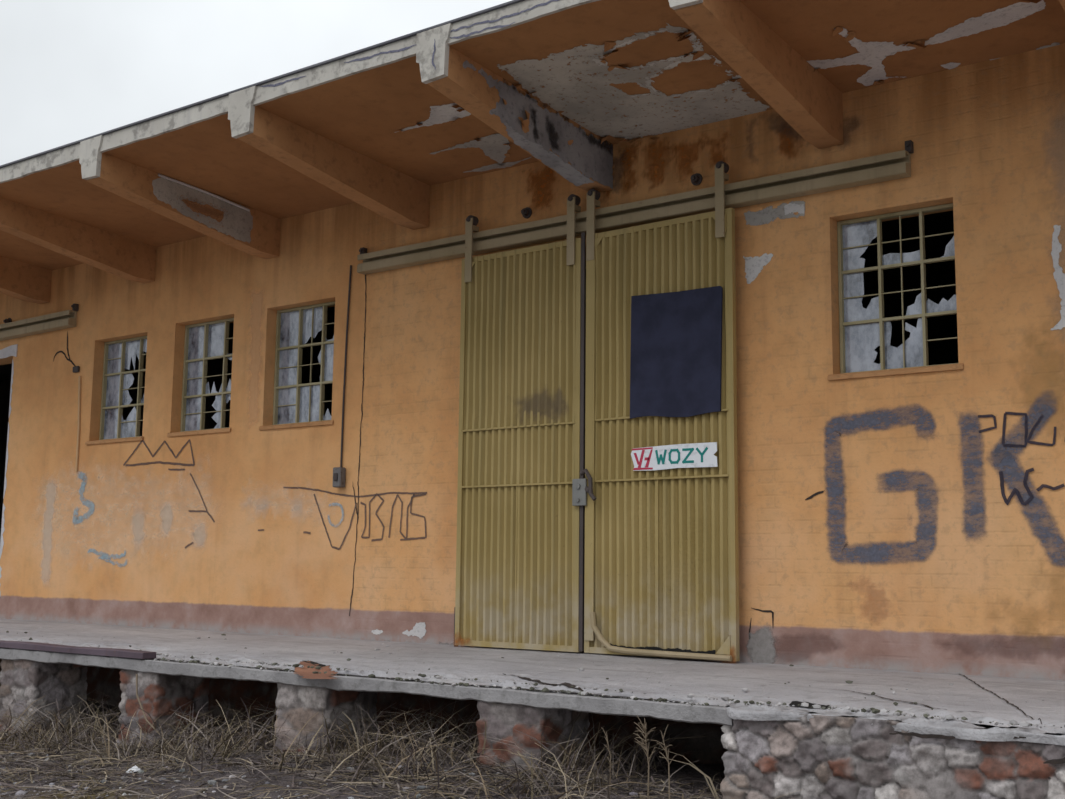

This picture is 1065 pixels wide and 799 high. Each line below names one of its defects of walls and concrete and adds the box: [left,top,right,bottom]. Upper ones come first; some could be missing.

peeling [807,0,1046,86]
peeling [394,103,471,134]
peeling [430,23,770,189]
spalling [152,174,253,243]
peeling [744,201,805,226]
peeling [743,253,773,284]
spalling [1051,225,1065,330]
spalling [293,661,338,679]
crack [836,674,1042,739]